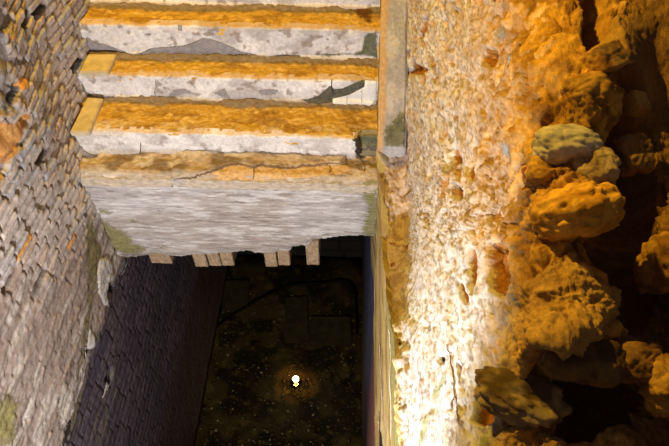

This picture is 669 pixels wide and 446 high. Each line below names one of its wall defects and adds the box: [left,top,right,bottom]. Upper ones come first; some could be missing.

flaking render [87,37,125,53]
flaking render [138,38,251,55]
crack [170,139,376,180]